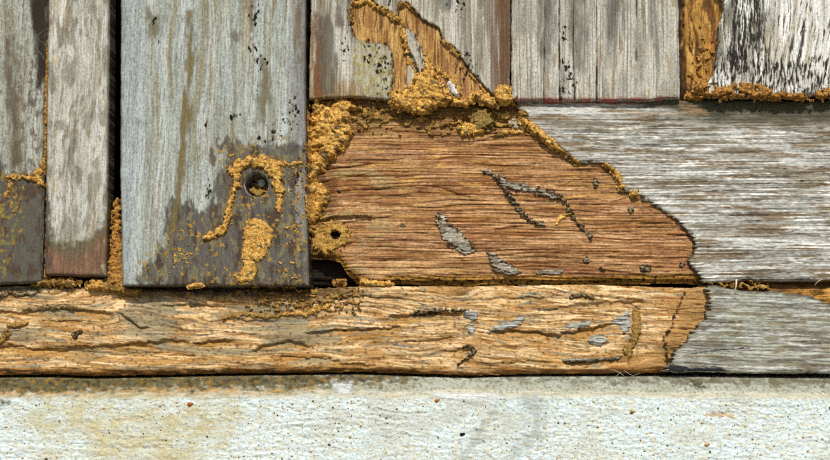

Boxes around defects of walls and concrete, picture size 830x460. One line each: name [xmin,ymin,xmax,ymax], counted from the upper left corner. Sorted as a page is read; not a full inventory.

leakage [147,10,159,43]
leakage [248,0,270,113]
peeling [470,108,497,133]
leakage [136,34,308,298]
leakage [0,71,52,296]
peeling [482,169,593,240]
peeling [435,212,475,256]
peeling [486,251,521,276]
leakage [0,368,430,396]
efflorescence [431,392,502,401]
leakage [627,376,756,385]